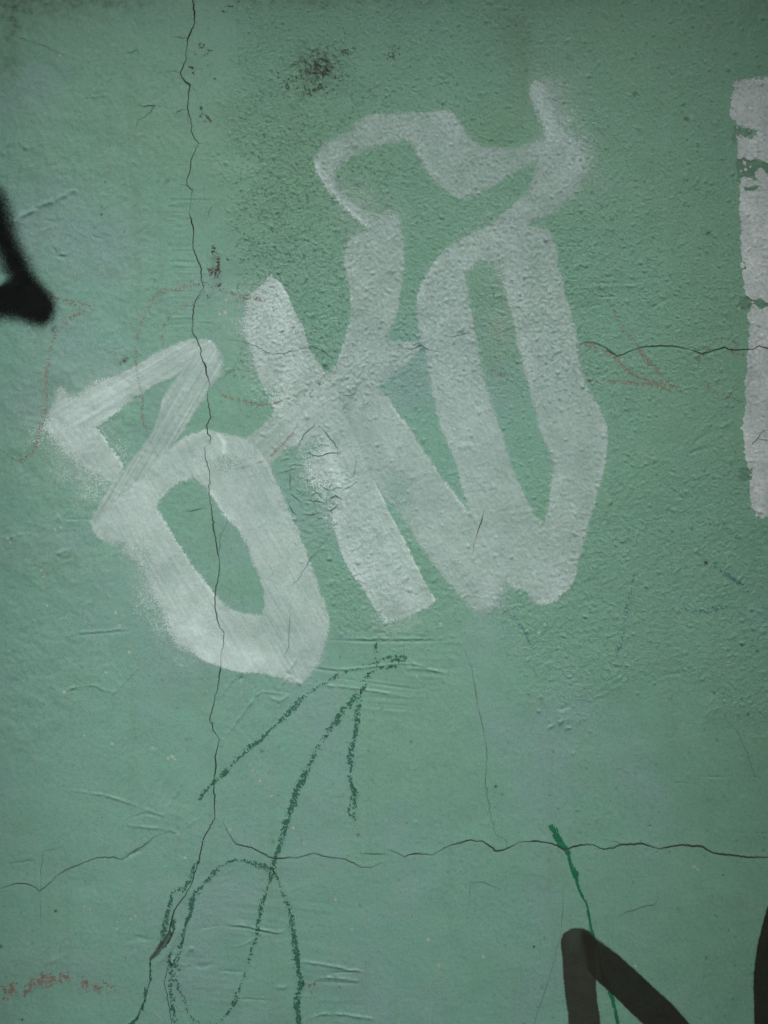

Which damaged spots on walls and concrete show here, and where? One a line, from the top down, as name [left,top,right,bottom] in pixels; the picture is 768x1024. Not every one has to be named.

crack [173,0,199,199]
crack [134,202,768,1024]